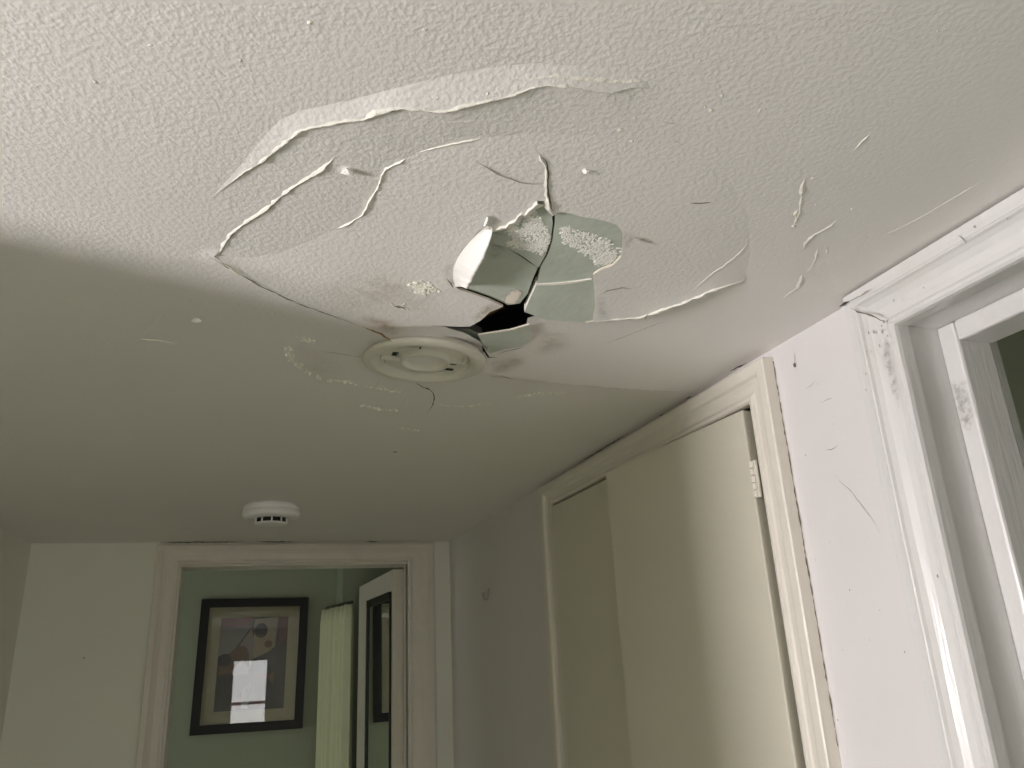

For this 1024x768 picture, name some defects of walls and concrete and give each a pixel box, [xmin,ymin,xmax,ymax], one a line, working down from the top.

peeling [213,84,655,198]
spalling [390,201,749,358]